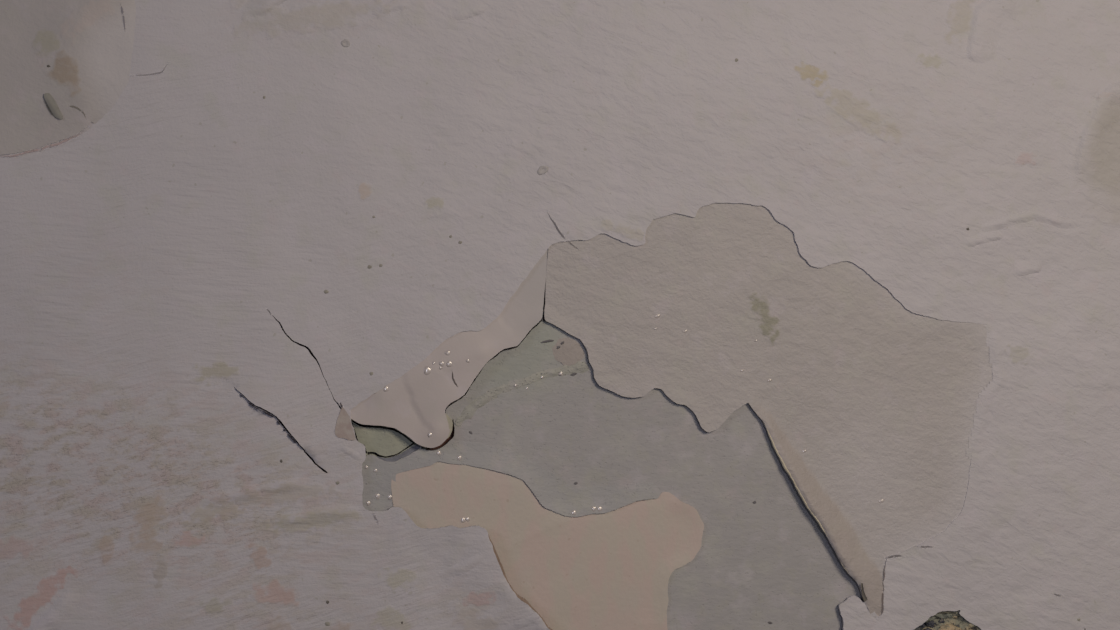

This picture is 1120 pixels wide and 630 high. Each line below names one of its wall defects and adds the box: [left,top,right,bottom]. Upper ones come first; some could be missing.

crack [267,309,342,409]
crack [234,387,327,473]
peeling [335,203,992,630]